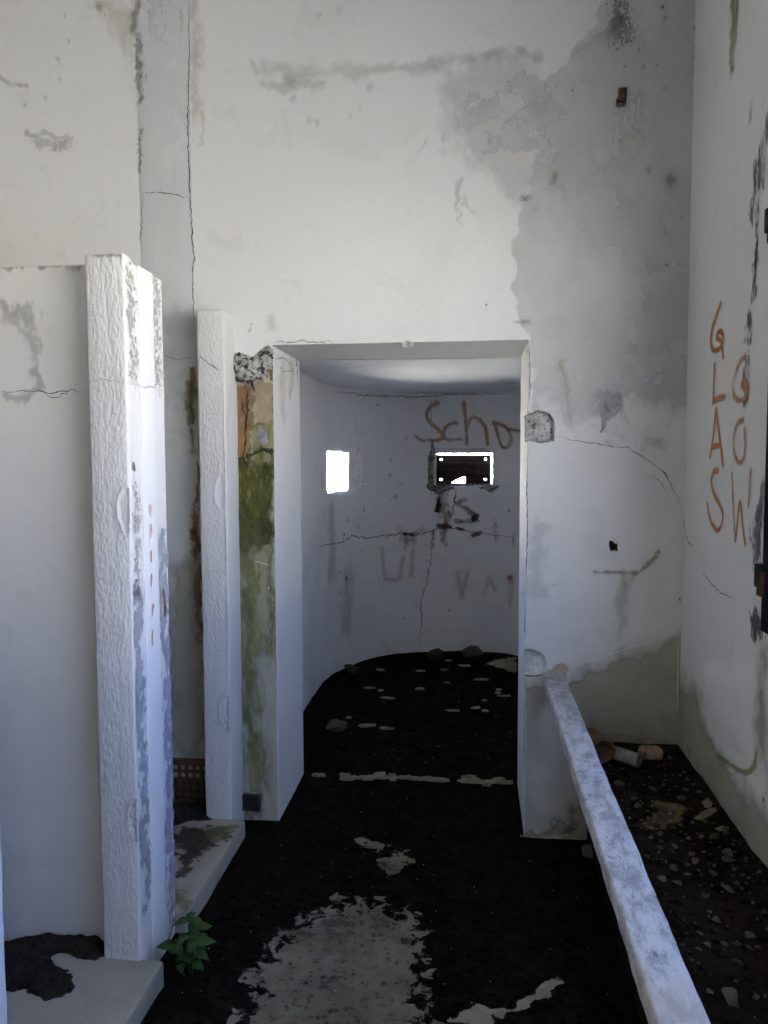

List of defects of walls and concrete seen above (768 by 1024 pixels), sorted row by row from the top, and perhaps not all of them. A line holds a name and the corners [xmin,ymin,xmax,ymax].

mould [598,0,640,68]
crack [139,1,195,323]
crack [0,378,161,398]
spalling [233,346,274,461]
spalling [524,410,555,444]
crack [320,457,561,645]
crack [560,436,691,546]
mould [749,480,765,564]
flaking render [218,478,278,821]
mould [749,606,763,643]
leakage [569,638,768,868]